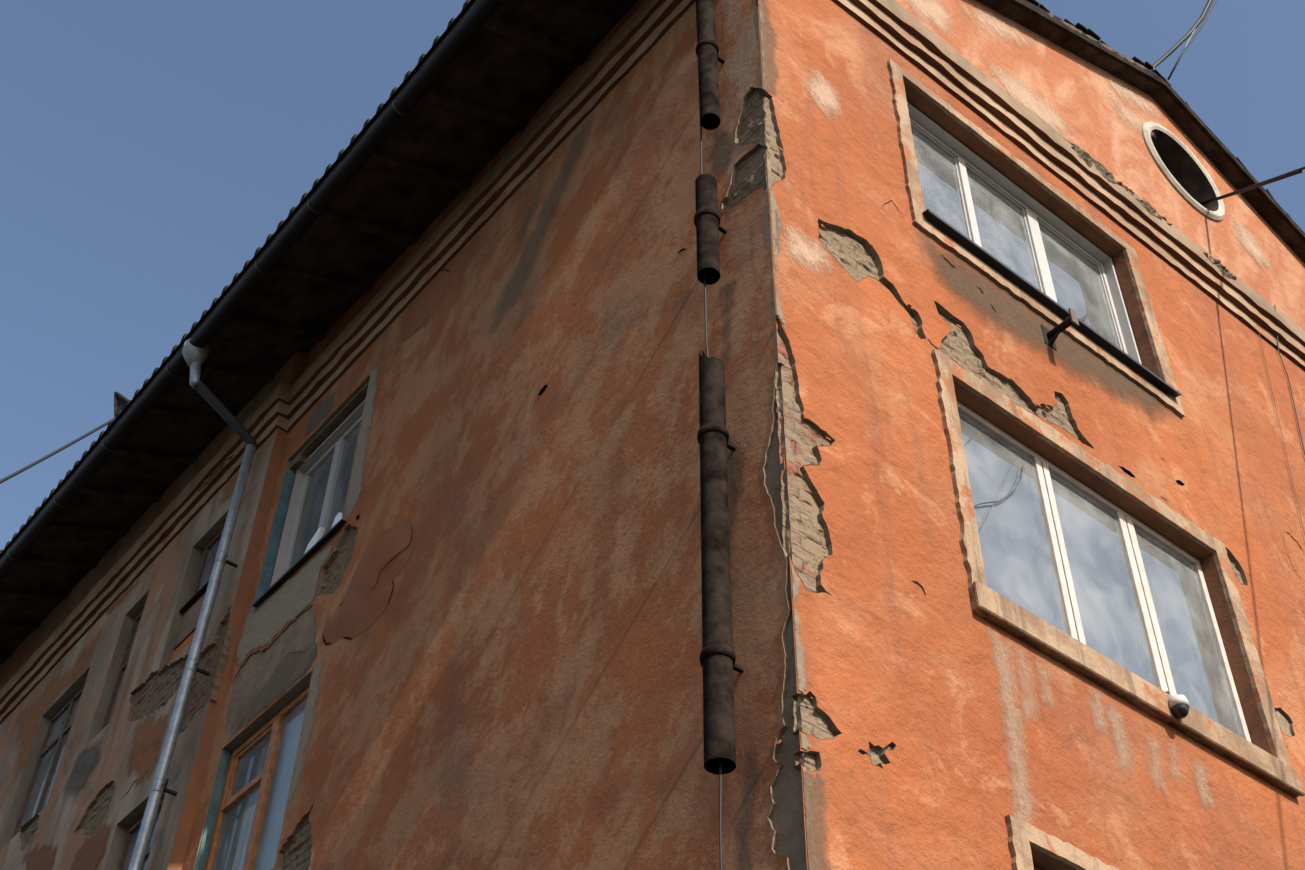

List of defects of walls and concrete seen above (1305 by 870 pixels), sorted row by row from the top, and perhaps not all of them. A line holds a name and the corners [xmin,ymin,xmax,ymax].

spalling [721,0,841,870]